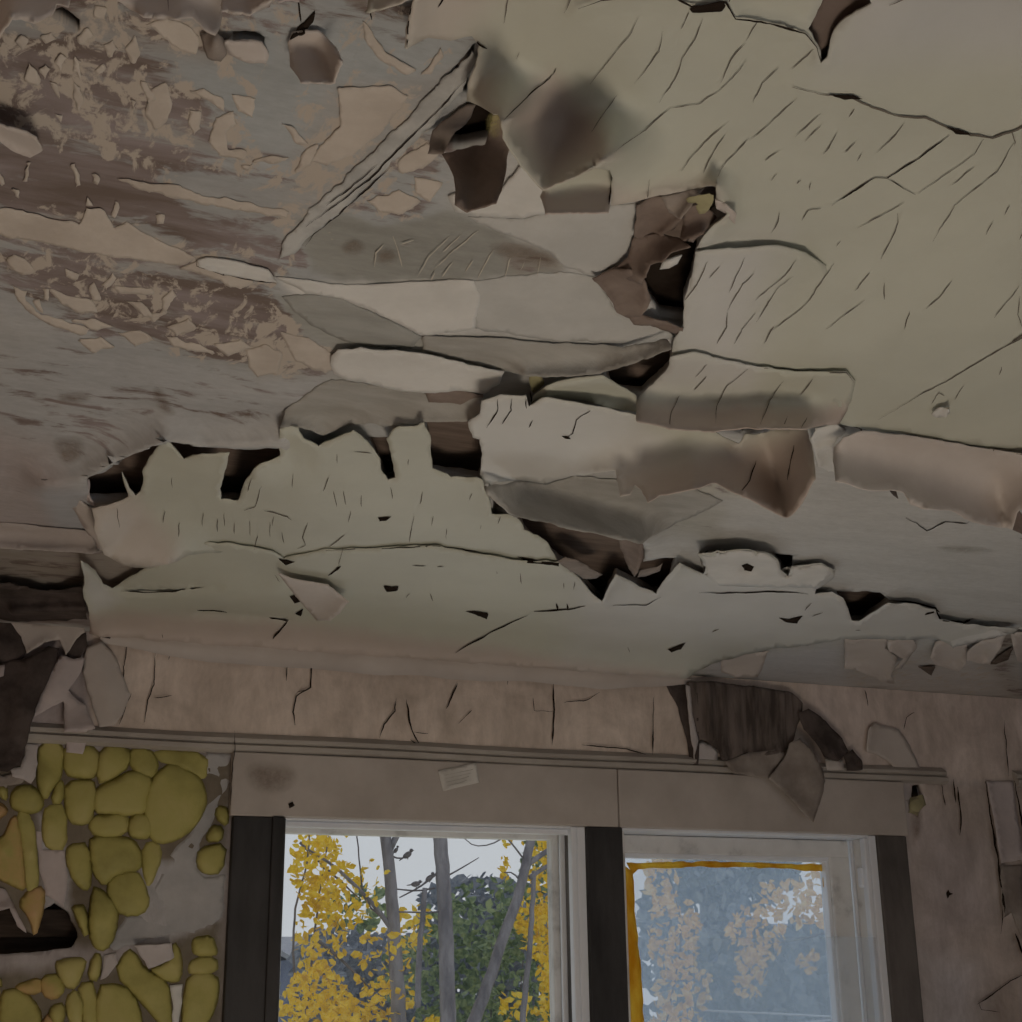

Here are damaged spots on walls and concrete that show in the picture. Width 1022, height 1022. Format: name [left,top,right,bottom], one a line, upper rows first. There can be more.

crack [616,0,1022,344]
crack [487,392,533,427]
peeling [0,0,1022,727]
crack [670,366,854,480]
crack [887,286,1022,455]
crack [163,478,501,576]
crack [456,557,584,653]
crack [716,591,821,616]
crack [380,700,428,743]
crack [533,684,596,743]
peeling [825,759,844,771]
peeling [0,743,231,1022]